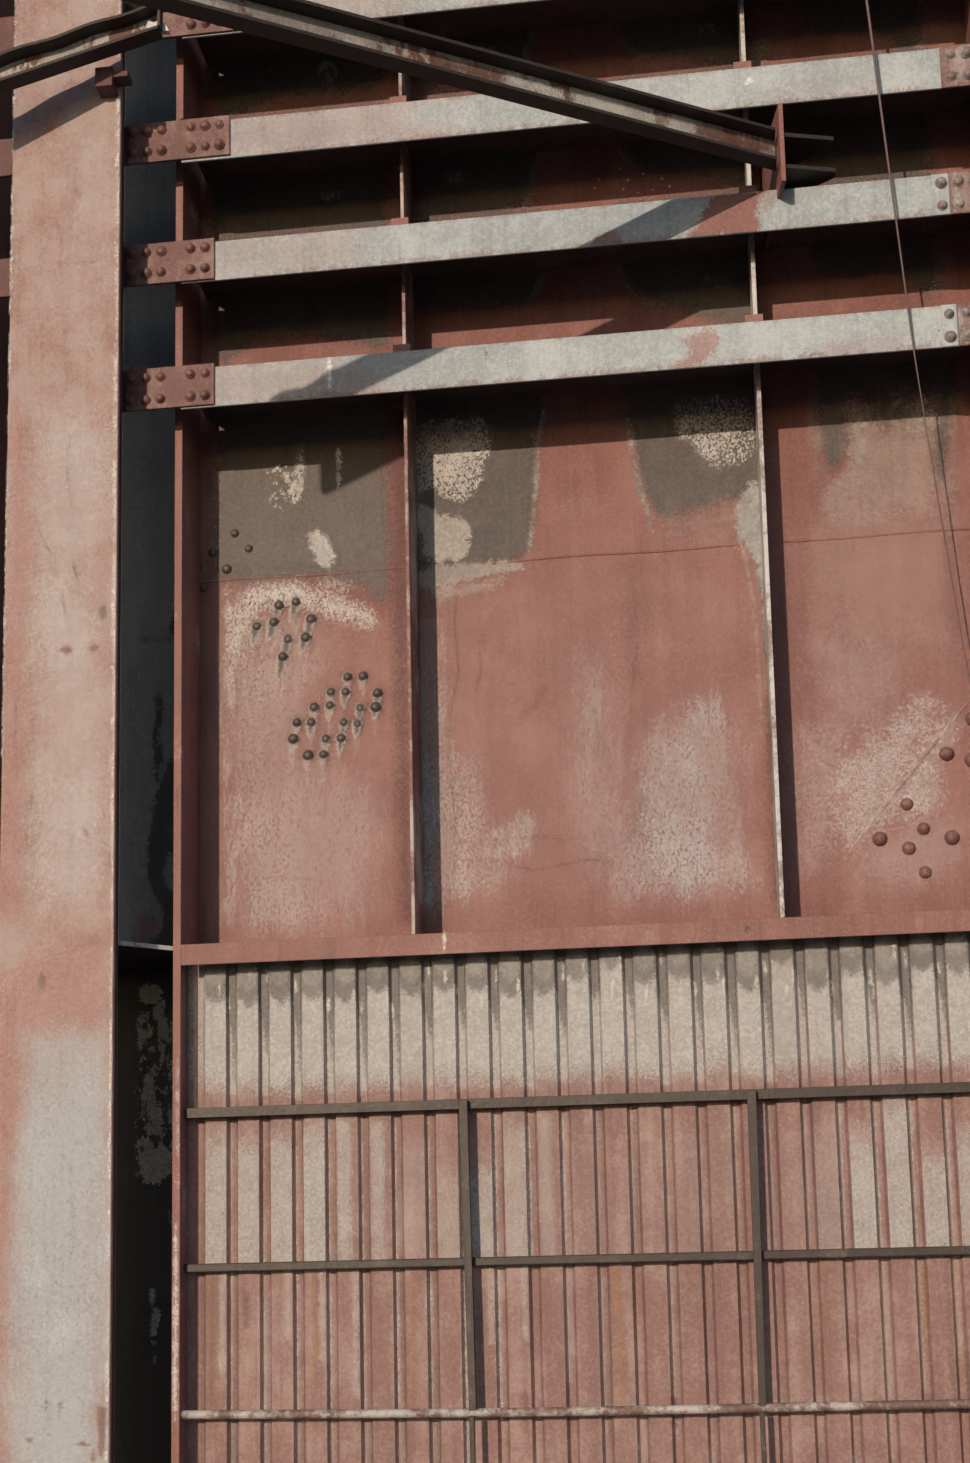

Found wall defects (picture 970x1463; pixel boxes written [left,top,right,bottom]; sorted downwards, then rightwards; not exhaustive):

corrosion [690,191,761,237]
corrosion [680,328,719,367]
peeling [416,391,544,582]
peeling [136,932,970,1184]